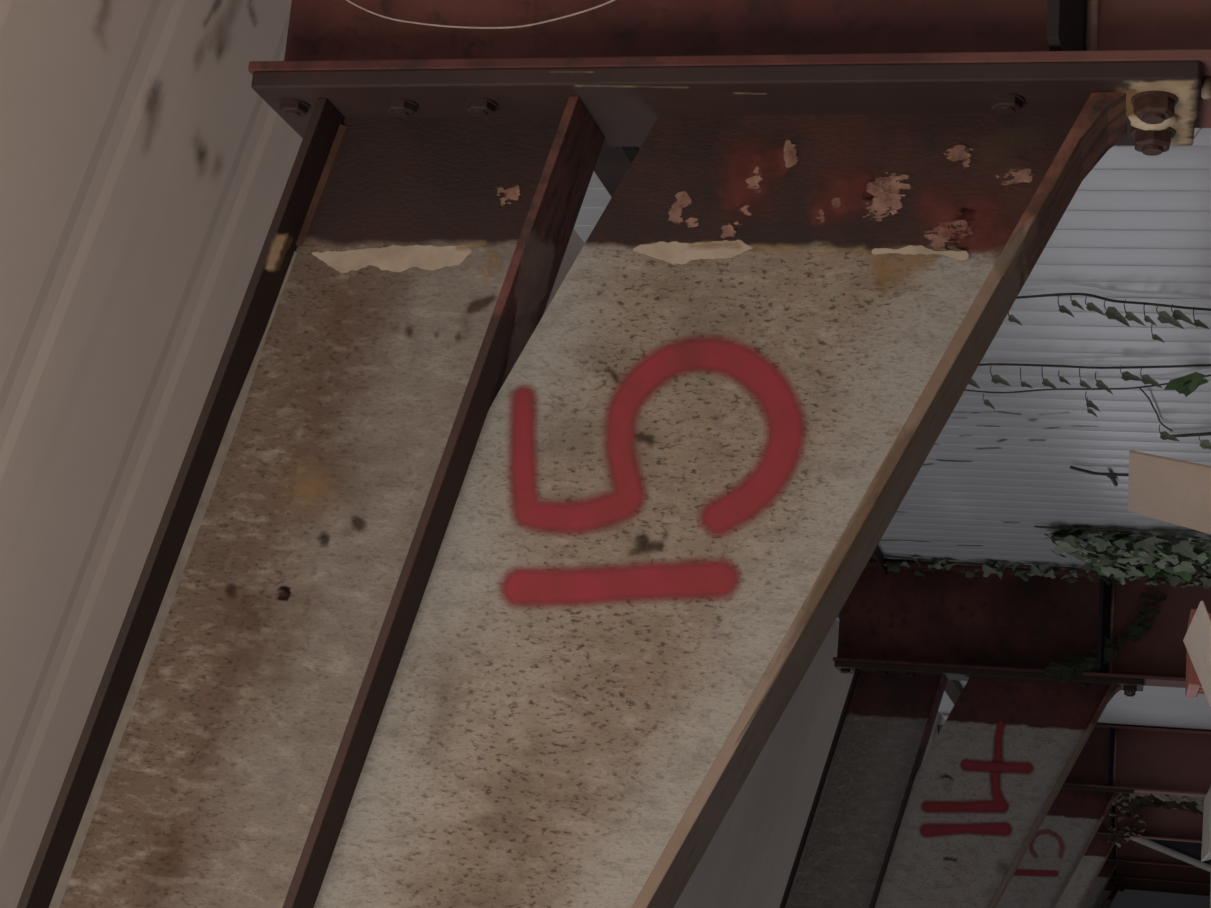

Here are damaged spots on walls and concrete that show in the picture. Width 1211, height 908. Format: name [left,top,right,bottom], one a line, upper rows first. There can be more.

peeling [633,140,867,265]
peeling [863,172,911,221]
peeling [312,243,484,273]